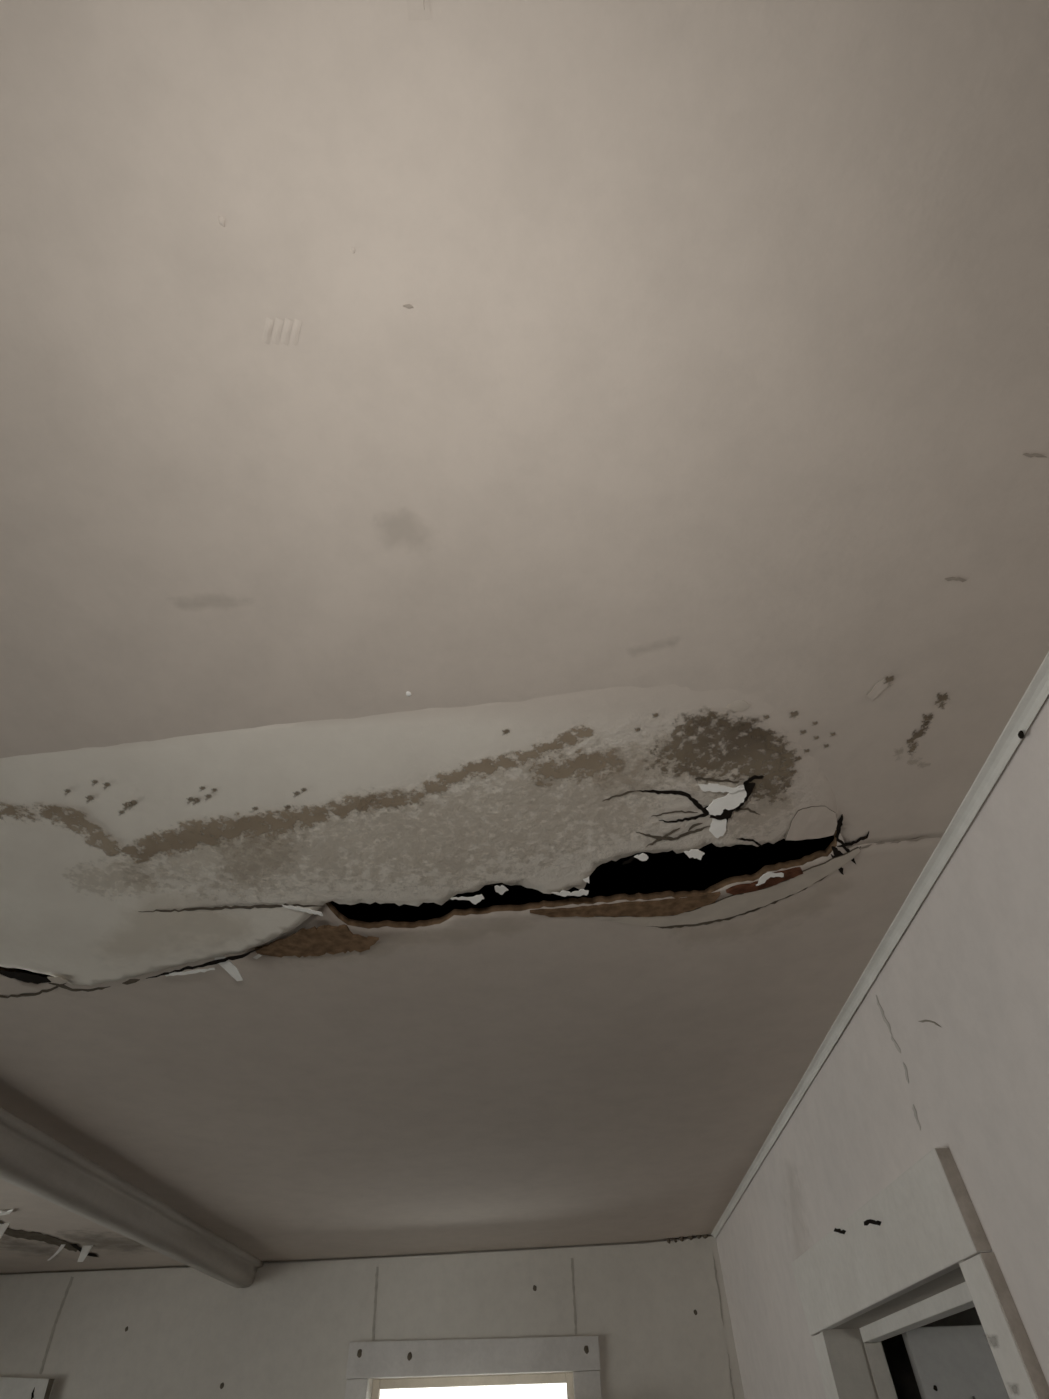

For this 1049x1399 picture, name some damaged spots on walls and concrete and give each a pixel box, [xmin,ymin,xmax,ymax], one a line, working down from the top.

leakage [0,726,625,863]
spalling [282,775,861,927]
leakage [646,710,835,802]
crack [646,814,925,929]